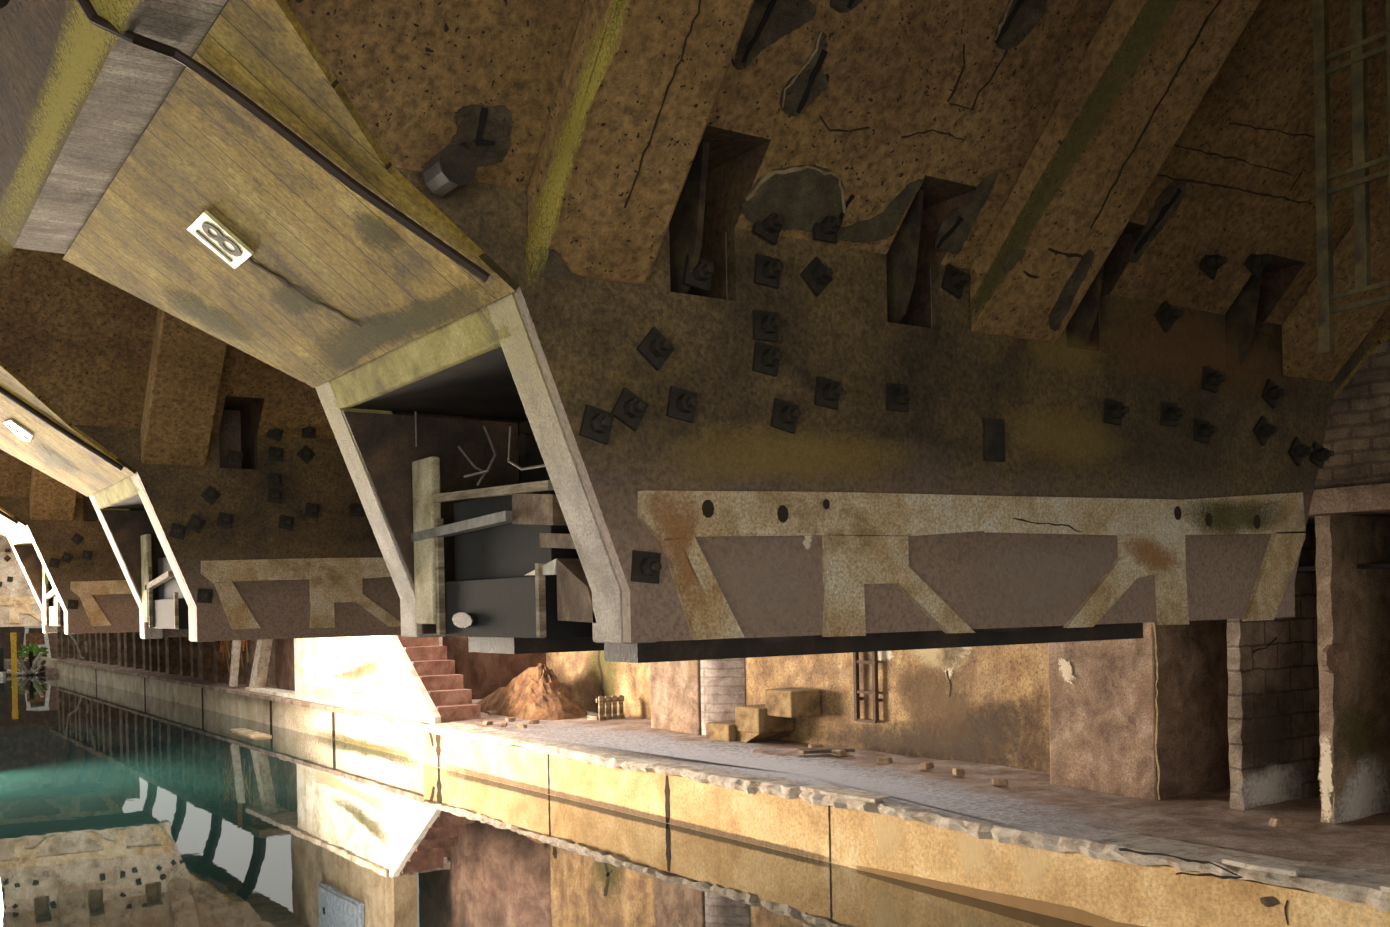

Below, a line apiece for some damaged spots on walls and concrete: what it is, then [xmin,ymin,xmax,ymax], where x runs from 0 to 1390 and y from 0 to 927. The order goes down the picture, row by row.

crack [624,0,701,209]
spalling [732,0,862,117]
spalling [994,0,1047,50]
crack [1023,0,1315,278]
spalling [741,164,923,243]
water stain [827,669,1045,770]
water stain [1236,688,1302,810]
water stain [1336,706,1390,824]